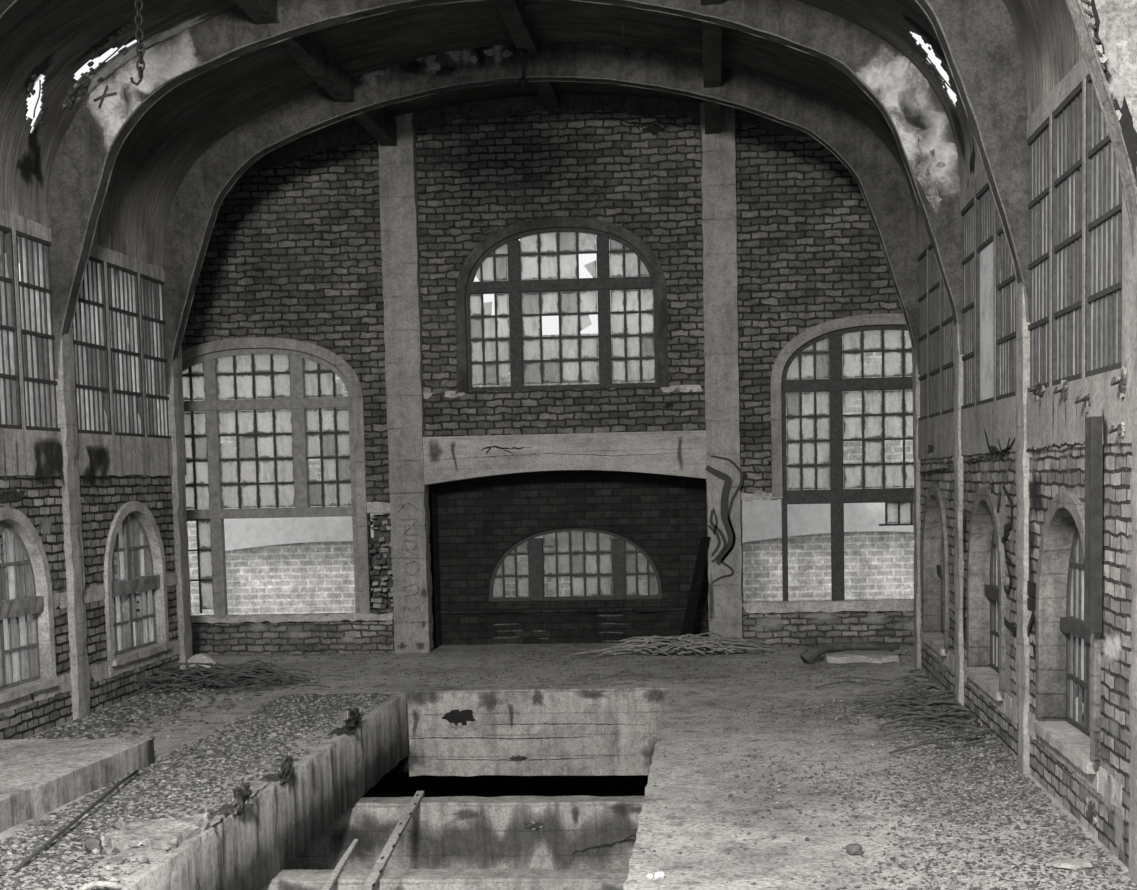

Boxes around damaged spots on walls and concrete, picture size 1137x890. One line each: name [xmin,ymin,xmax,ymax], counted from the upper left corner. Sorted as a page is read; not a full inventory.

spalling [62,36,117,109]
damp [905,17,947,64]
peeling [919,58,952,85]
crack [1091,0,1116,109]
peeling [27,74,48,125]
damp [858,56,975,188]
hole [442,709,475,729]
spalling [209,767,281,815]
damp [339,820,394,856]
damp [409,804,639,868]